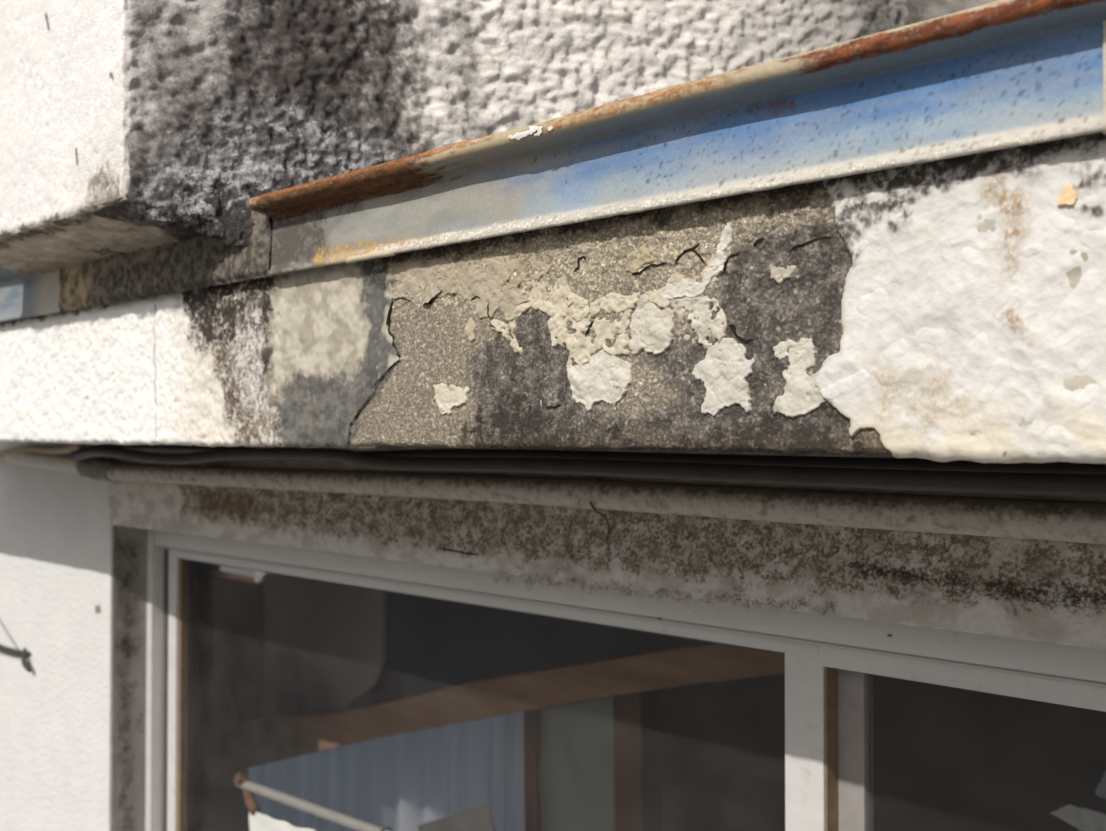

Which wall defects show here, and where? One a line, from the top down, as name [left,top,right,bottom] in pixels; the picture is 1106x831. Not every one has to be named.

rust [783,0,1105,73]
leakage [0,0,426,249]
rust [249,136,490,222]
rust [543,75,724,135]
peeling [983,130,1055,147]
leakage [181,257,398,449]
crack [347,290,442,447]
peeling [345,148,947,454]
leakage [459,393,847,455]
mould [179,485,1106,615]